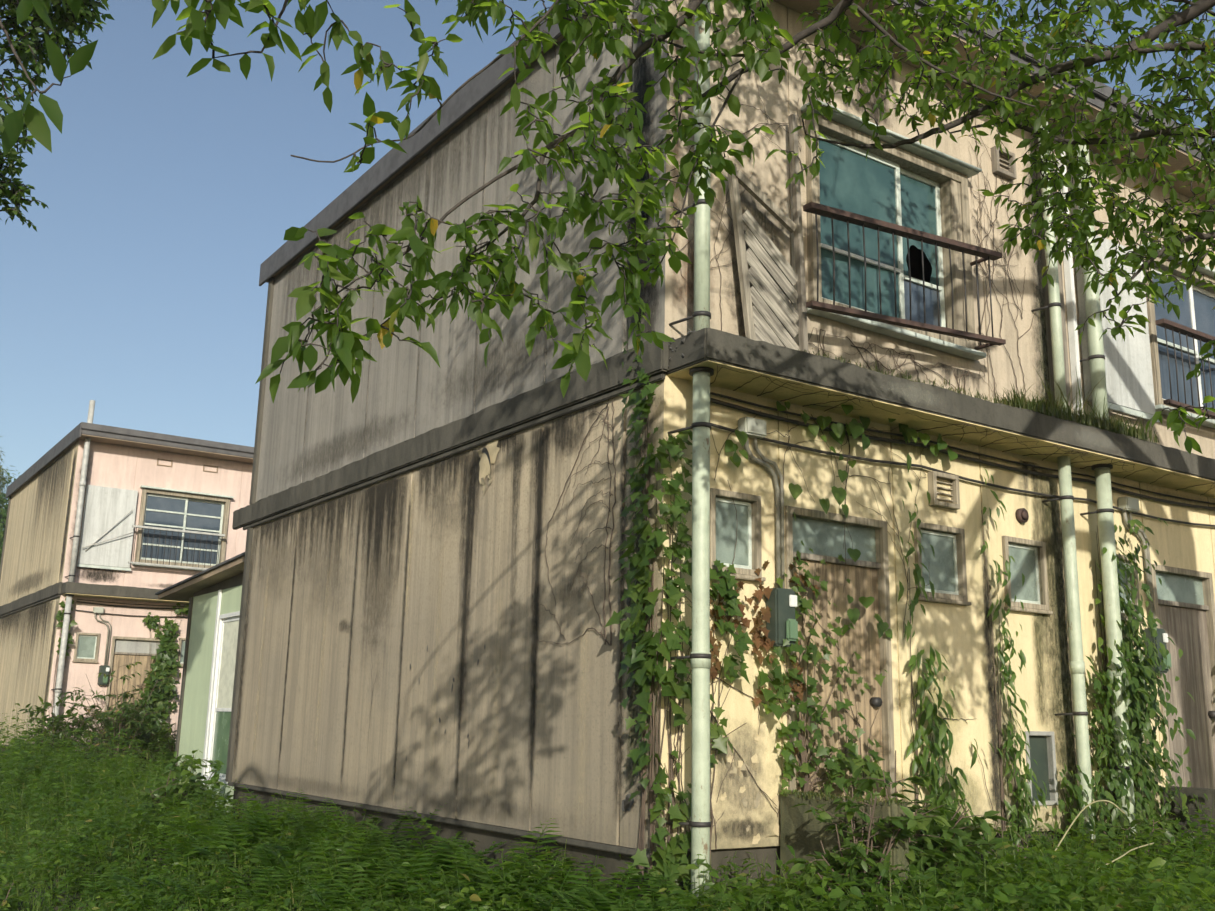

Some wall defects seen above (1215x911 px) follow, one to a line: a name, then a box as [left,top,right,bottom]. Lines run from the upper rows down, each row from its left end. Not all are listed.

leakage [234,564,252,757]
leakage [255,451,480,778]
leakage [500,405,597,784]
leakage [982,537,1012,809]
leakage [1021,460,1078,799]